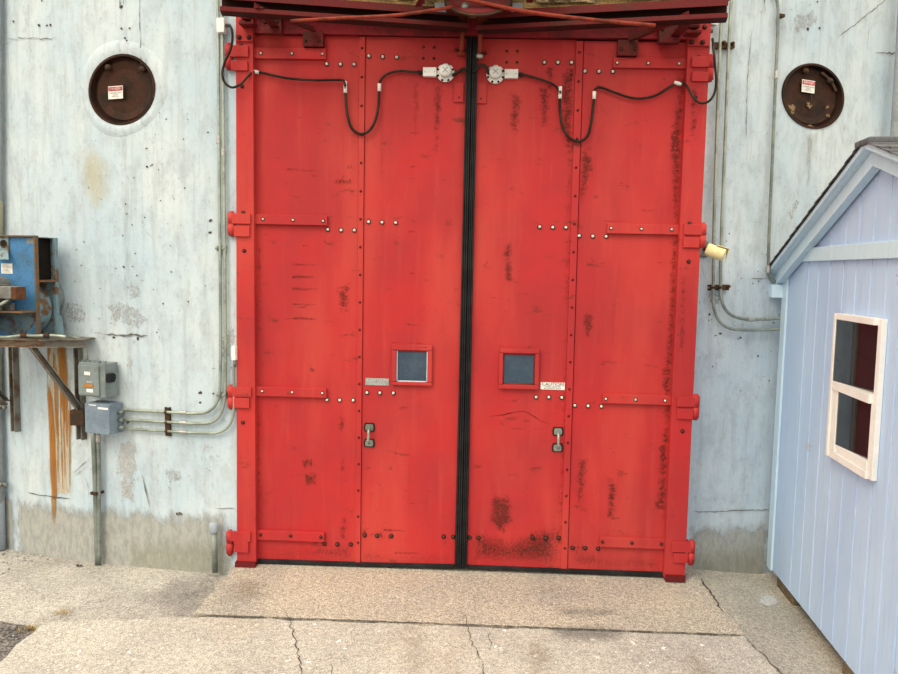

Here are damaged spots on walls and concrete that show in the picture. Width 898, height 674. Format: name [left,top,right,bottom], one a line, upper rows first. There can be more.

crack [839,0,895,55]
rust [47,347,71,516]
rust [656,435,668,509]
rust [492,498,510,529]
crack [194,611,783,674]